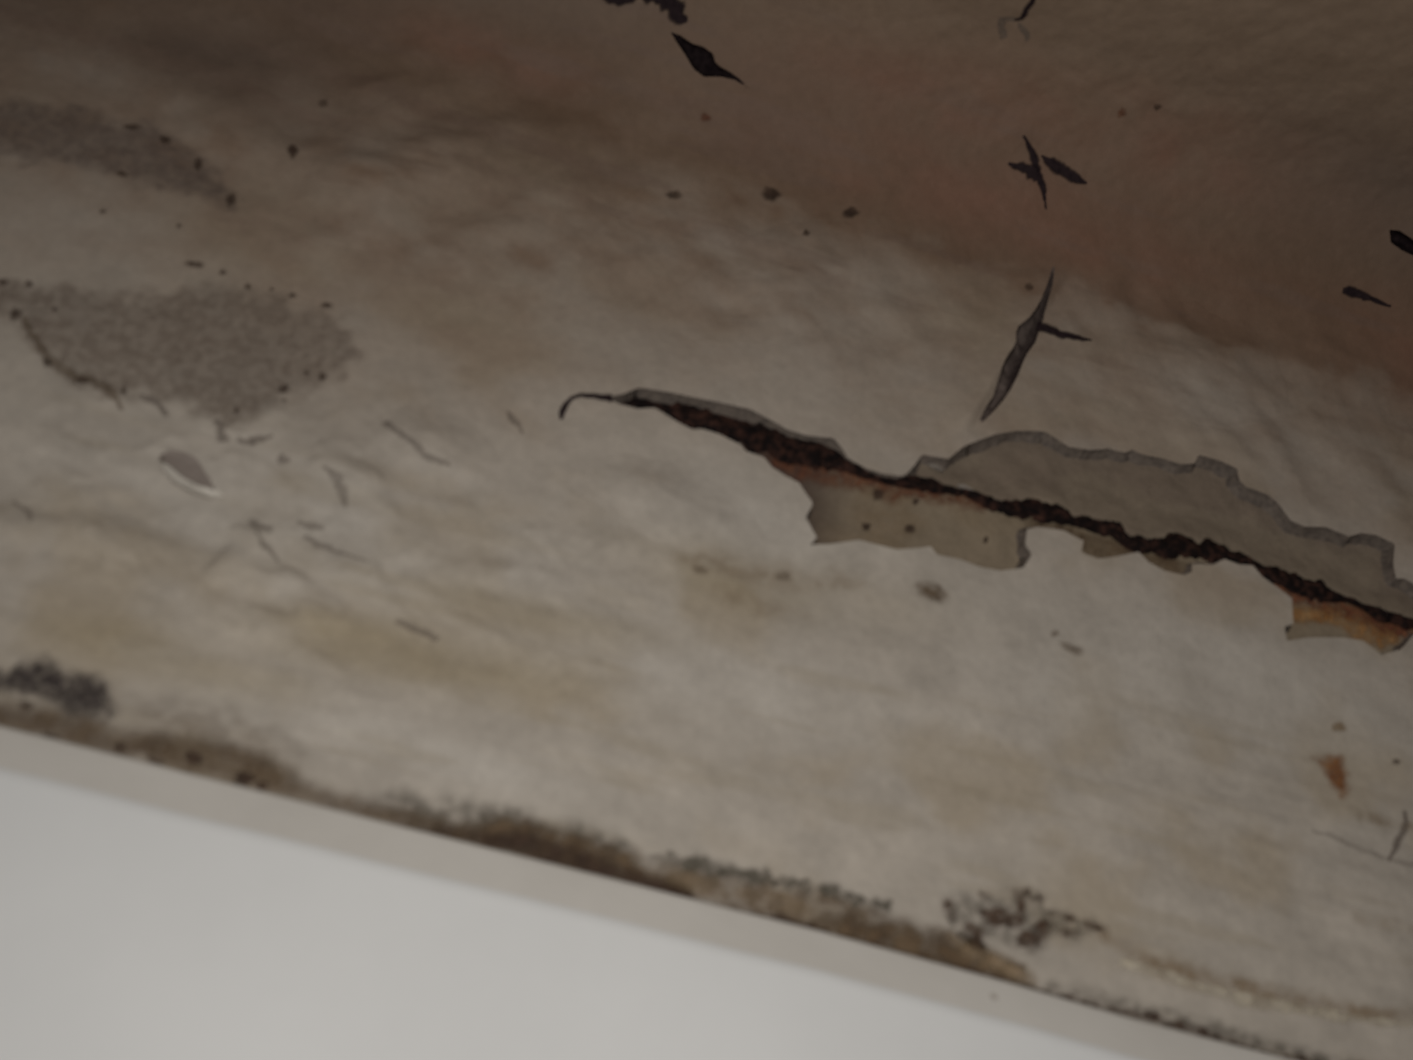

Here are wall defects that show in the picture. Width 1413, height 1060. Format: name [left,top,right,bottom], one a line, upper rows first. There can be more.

crack [606,0,744,84]
crack [999,0,1035,40]
crack [1008,135,1087,209]
crack [1389,230,1413,255]
crack [1342,286,1391,307]
crack [980,267,1092,422]
spalling [559,388,1413,655]
rust [1322,757,1345,791]
damp [0,664,1327,1060]